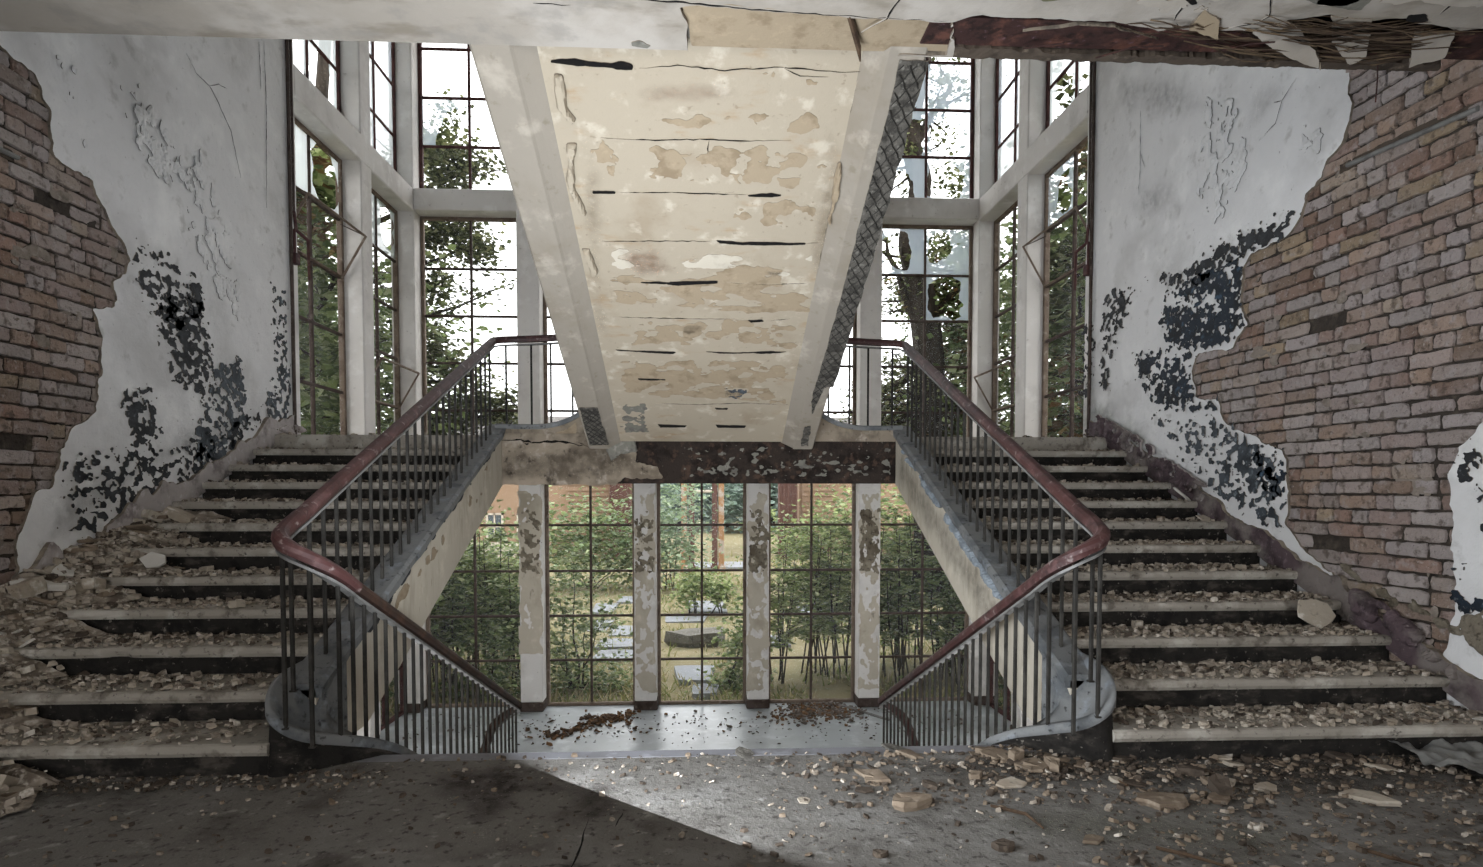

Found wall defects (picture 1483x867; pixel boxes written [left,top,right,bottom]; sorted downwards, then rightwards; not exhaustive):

crack [532,0,571,8]
crack [644,0,947,33]
flaking render [1308,0,1483,10]
spalling [551,40,650,70]
crack [639,63,859,113]
peeling [662,114,730,129]
peeling [787,112,820,135]
peeling [590,140,619,194]
peeling [610,145,827,433]
flaking render [0,49,291,584]
flaking render [1081,59,1483,680]
crack [570,812,624,867]